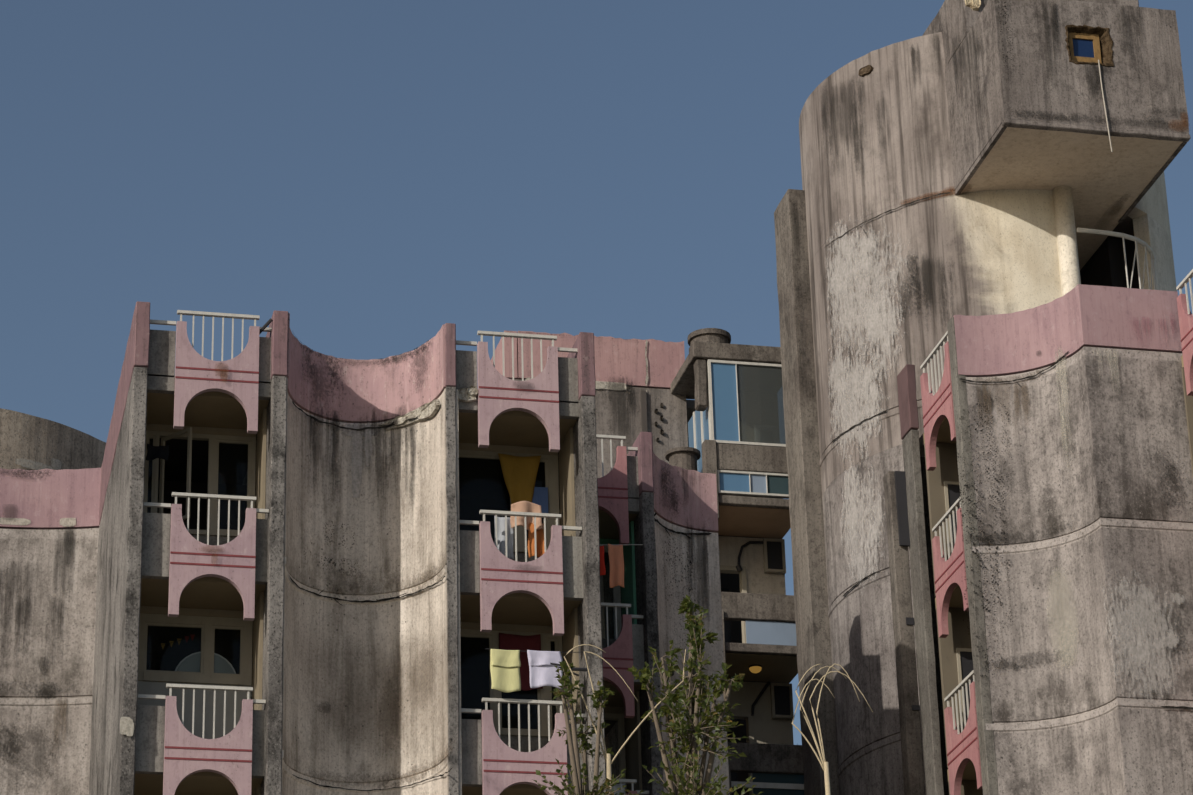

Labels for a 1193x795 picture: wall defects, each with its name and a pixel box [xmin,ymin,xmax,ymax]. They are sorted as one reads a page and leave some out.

spalling [964,0,981,11]
crack [824,192,950,248]
leakage [827,223,912,594]
leakage [1103,573,1185,699]